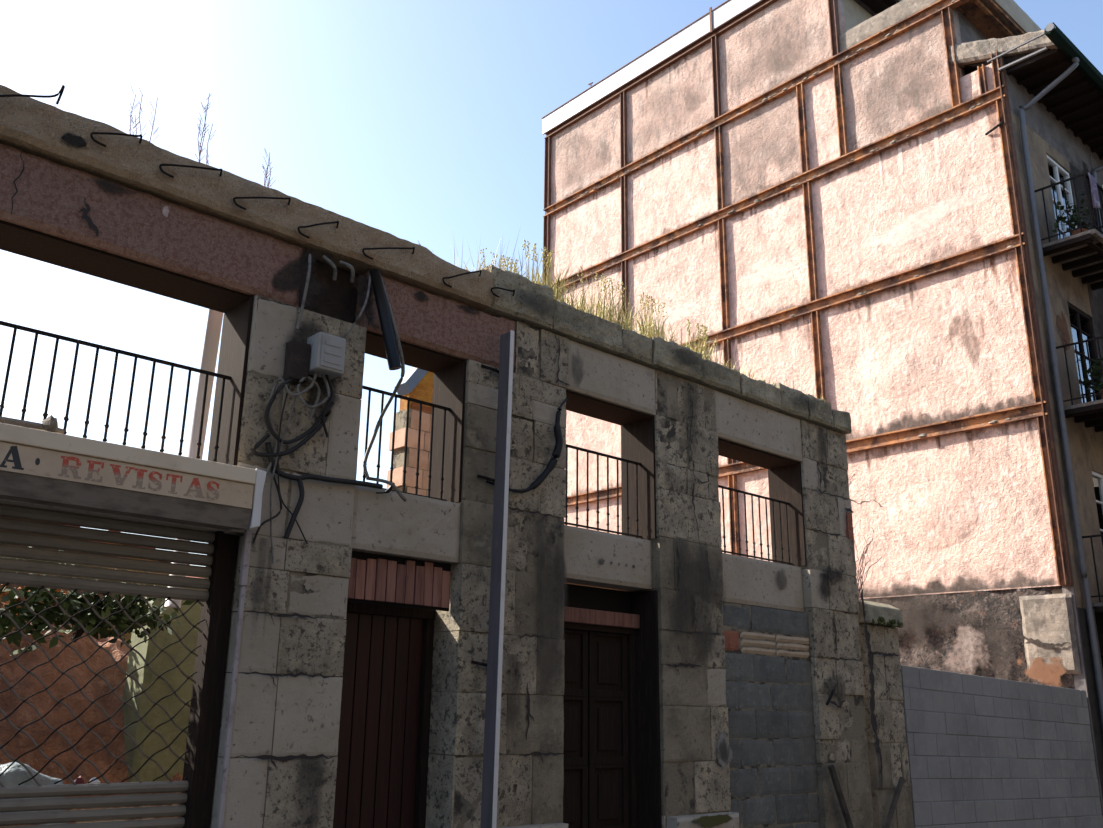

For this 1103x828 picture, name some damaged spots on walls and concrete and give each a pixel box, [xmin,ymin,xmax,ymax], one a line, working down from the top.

crack [11,150,24,214]
water stain [875,396,1033,435]
water stain [821,566,842,602]
water stain [858,577,1054,652]
flaking render [945,593,1081,687]